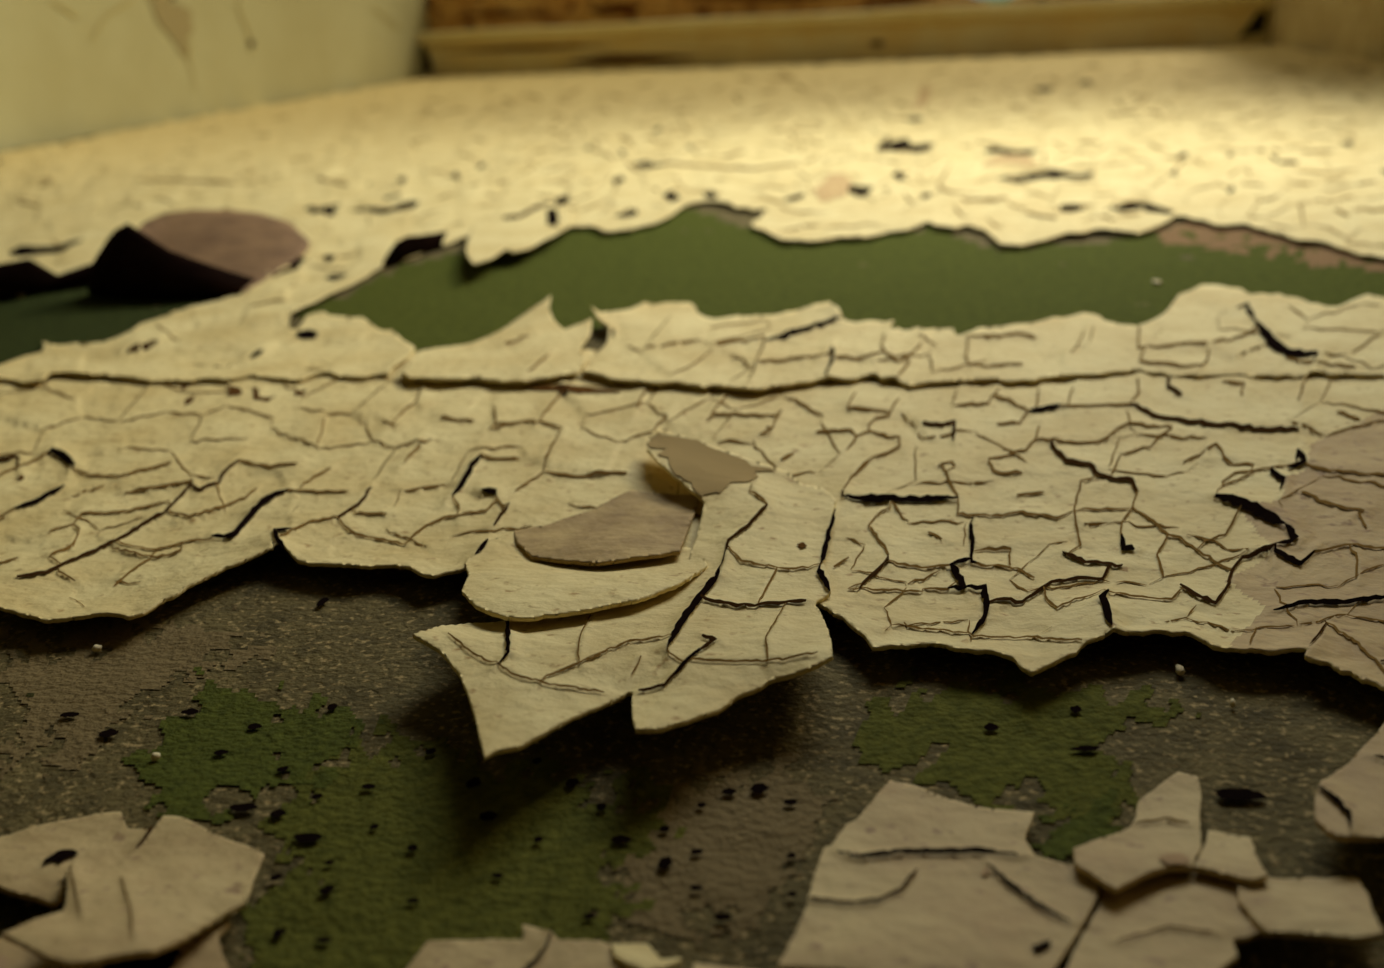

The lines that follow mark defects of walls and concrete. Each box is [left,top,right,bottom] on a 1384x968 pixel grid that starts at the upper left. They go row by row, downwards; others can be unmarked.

crack [503,201,551,219]
crack [661,162,799,170]
crack [937,155,1057,219]
crack [1271,150,1334,164]
peeling [0,45,1384,760]
crack [0,302,1384,693]
spalling [229,802,286,818]
crack [1317,786,1352,828]
peeling [1314,724,1384,843]
peeling [0,816,283,968]
peeling [778,772,1383,968]
peeling [407,924,733,968]